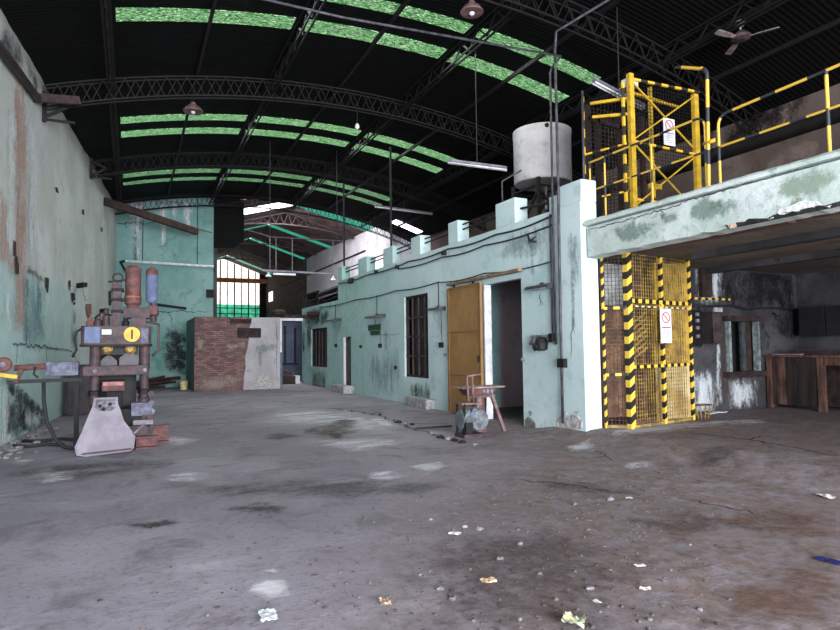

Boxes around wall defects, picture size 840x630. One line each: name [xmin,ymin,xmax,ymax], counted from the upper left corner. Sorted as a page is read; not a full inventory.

rust [0,65,27,331]
crack [12,342,77,363]
water stain [694,333,727,411]
water stain [7,384,44,437]
spalling [556,411,583,429]
crack [689,432,839,456]